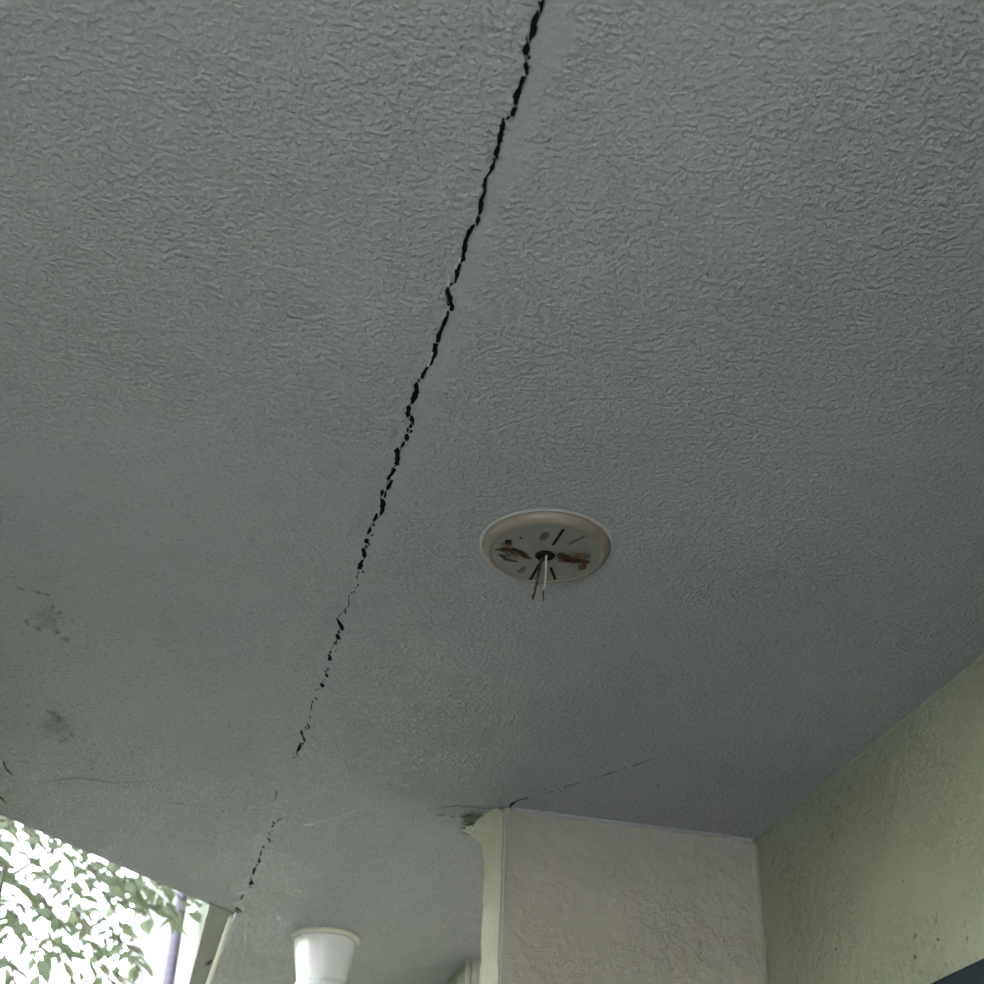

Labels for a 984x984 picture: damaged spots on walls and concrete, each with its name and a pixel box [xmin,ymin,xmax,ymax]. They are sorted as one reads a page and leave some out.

crack [292,0,547,758]
crack [510,757,657,808]
crack [234,791,283,913]